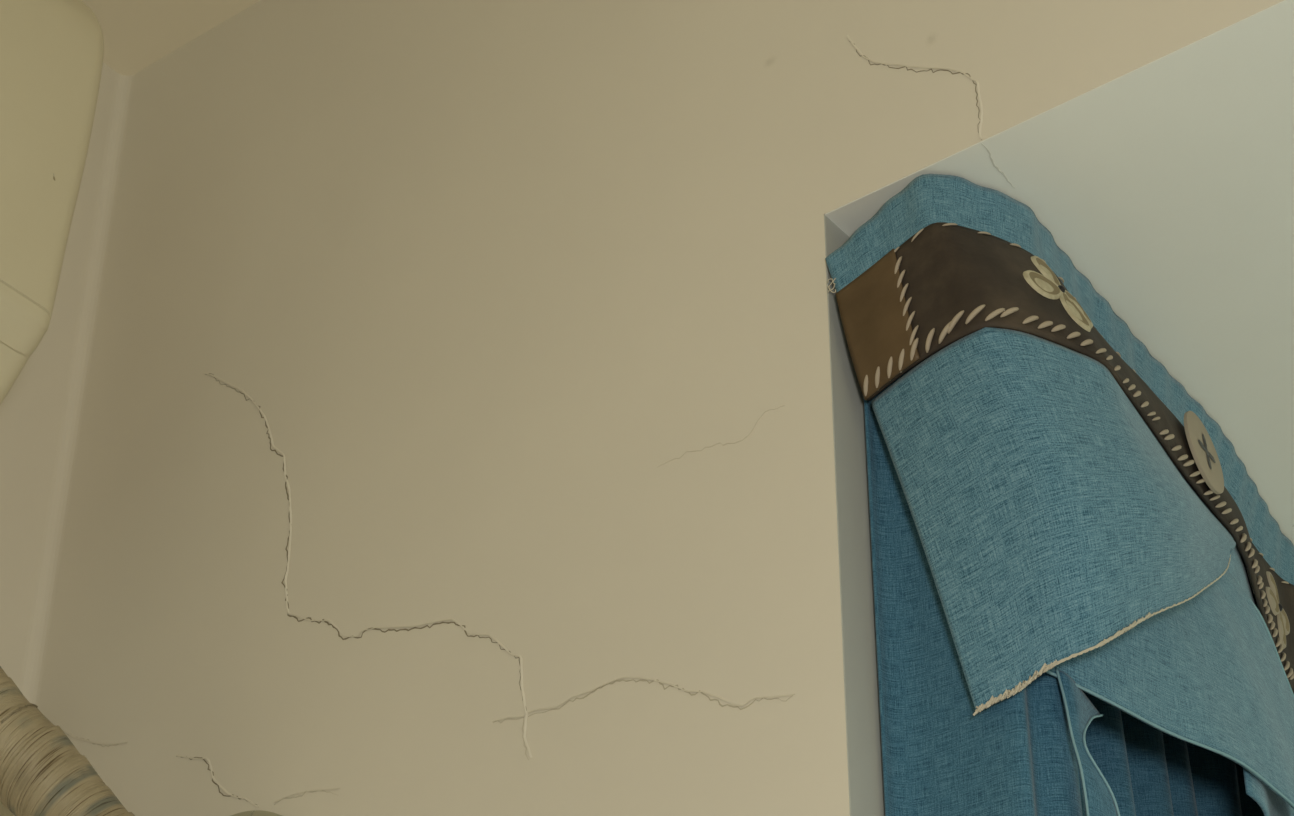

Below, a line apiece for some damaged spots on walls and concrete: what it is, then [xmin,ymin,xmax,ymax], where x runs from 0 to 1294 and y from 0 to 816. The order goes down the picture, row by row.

crack [846,35,1014,188]
crack [204,373,795,760]